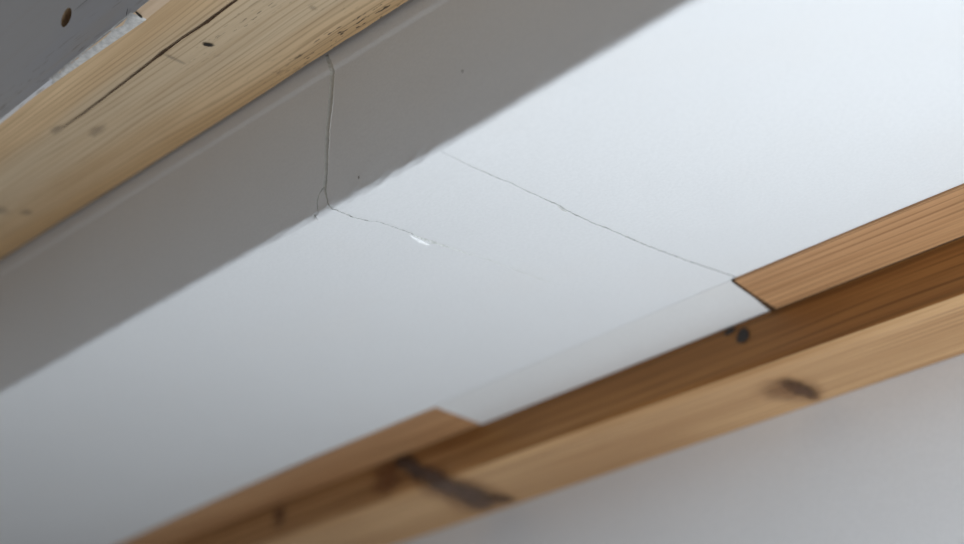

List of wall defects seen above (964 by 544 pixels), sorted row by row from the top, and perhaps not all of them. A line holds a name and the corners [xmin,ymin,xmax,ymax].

crack [313,54,557,285]
crack [443,152,736,278]